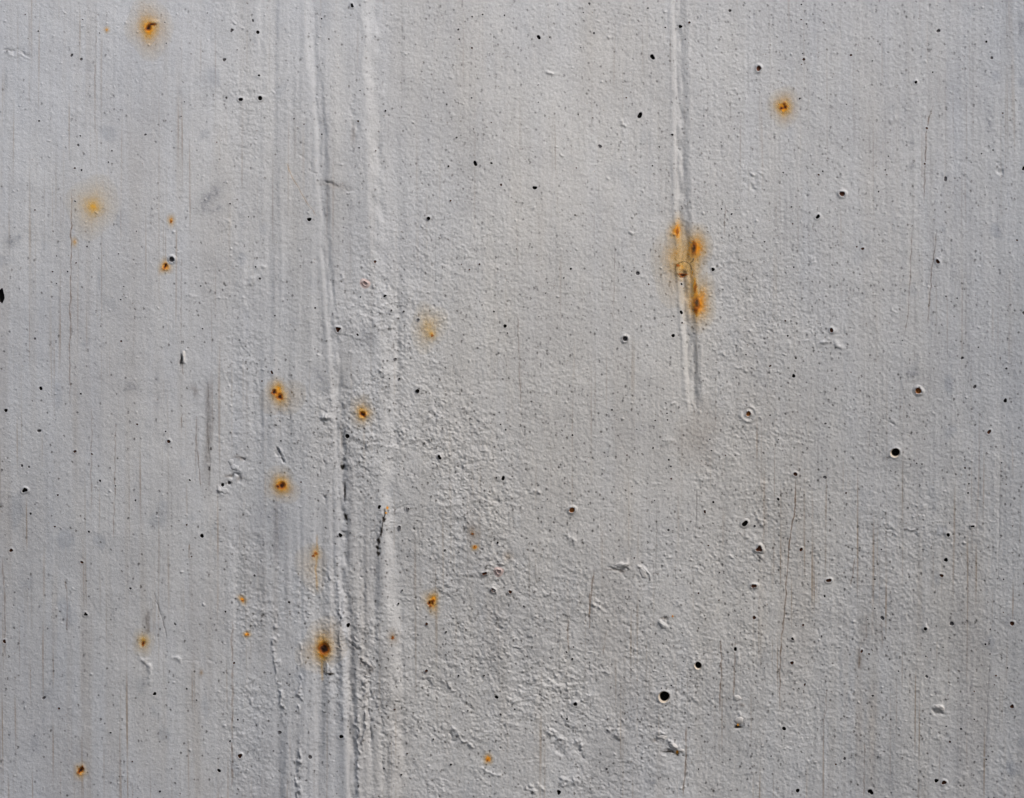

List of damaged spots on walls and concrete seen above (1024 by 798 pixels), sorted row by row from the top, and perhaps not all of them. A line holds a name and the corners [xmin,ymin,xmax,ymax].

corrosion [672,223,706,316]
corrosion [318,640,330,658]